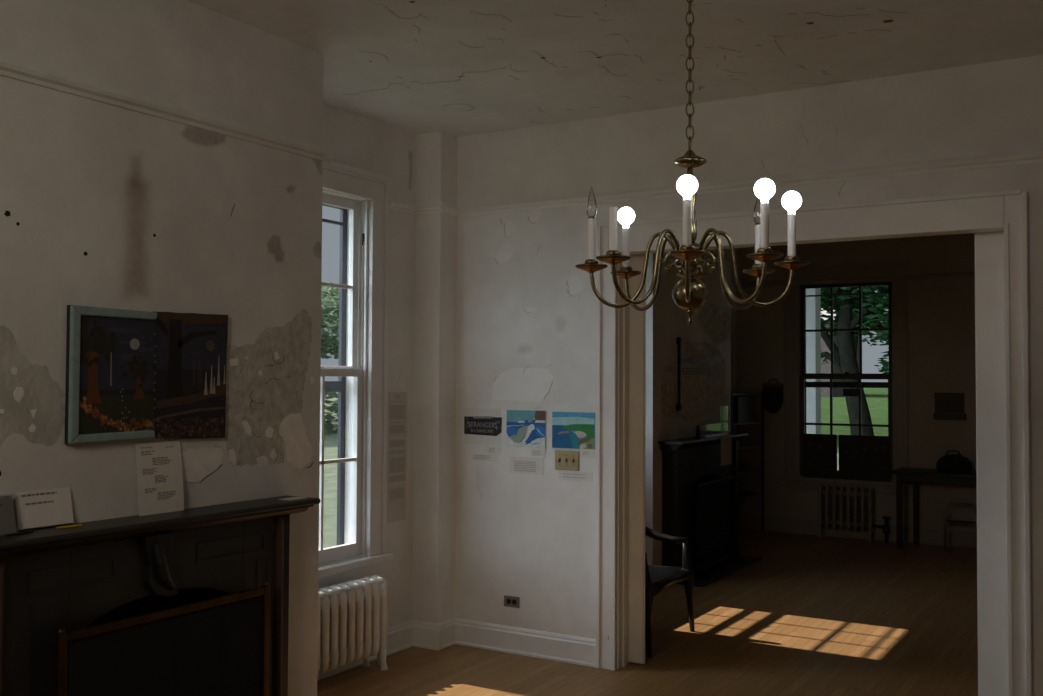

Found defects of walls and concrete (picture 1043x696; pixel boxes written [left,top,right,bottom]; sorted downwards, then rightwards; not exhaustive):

peeling [0,325,65,448]
peeling [225,309,312,466]